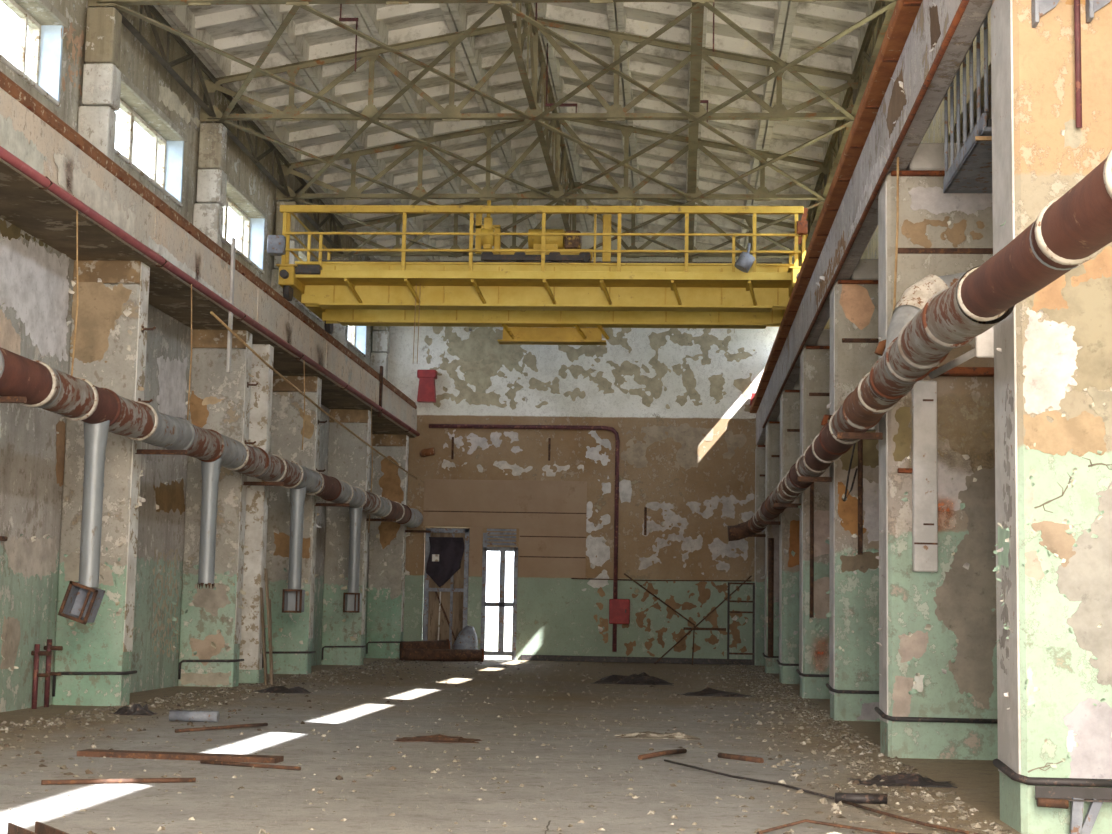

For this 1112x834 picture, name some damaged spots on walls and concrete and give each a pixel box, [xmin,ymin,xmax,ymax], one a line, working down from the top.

peeling [0,219,132,363]
peeling [424,326,755,412]
corrosion [928,367,994,377]
peeling [442,423,754,657]
peeling [857,242,1112,787]
crack [1034,457,1112,513]